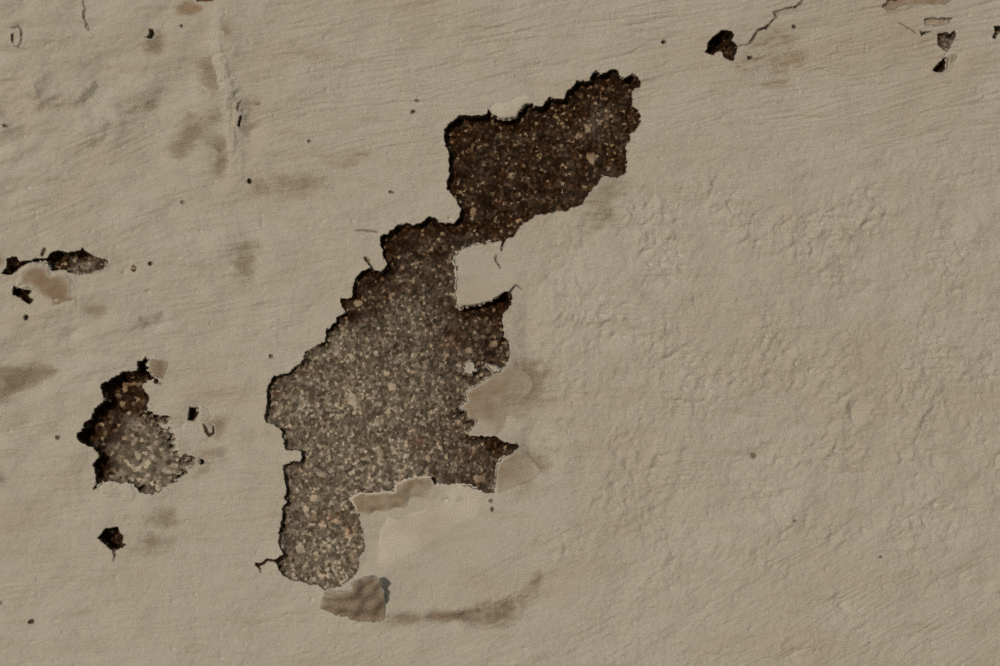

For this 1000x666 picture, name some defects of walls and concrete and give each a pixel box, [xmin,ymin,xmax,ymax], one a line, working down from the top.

peeling [882,0,948,11]
crack [736,2,801,47]
spalling [706,34,734,60]
spalling [921,18,958,73]
spalling [6,247,108,275]
spalling [15,287,33,303]
spalling [255,71,639,623]
spalling [80,358,214,502]
spalling [100,527,124,557]